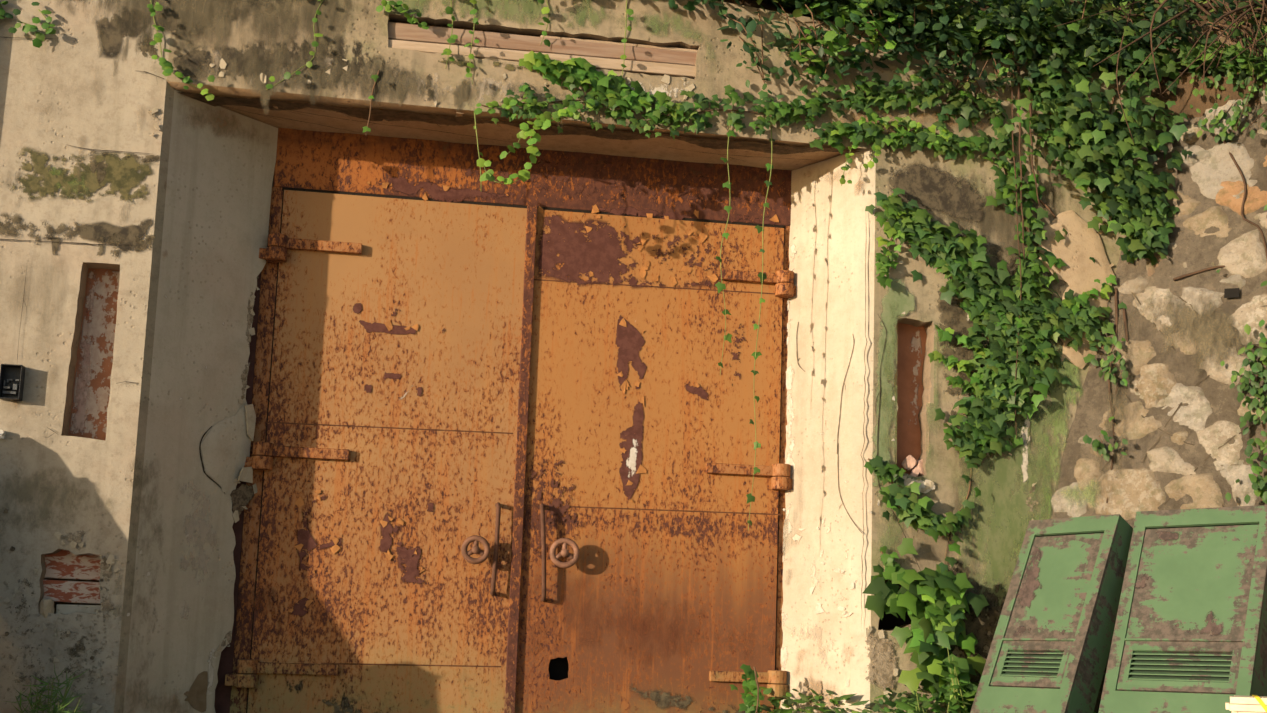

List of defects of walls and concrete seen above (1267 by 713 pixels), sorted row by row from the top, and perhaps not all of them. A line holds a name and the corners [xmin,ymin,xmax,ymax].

damp [97,0,434,112]
damp [454,80,478,110]
damp [125,154,159,162]
damp [0,214,155,257]
peeling [70,271,120,439]
corrosion [526,459,583,568]
crack [837,229,921,620]
peeling [910,331,922,424]
spalling [901,455,935,493]
damp [1002,386,1038,482]
spalling [4,554,130,713]